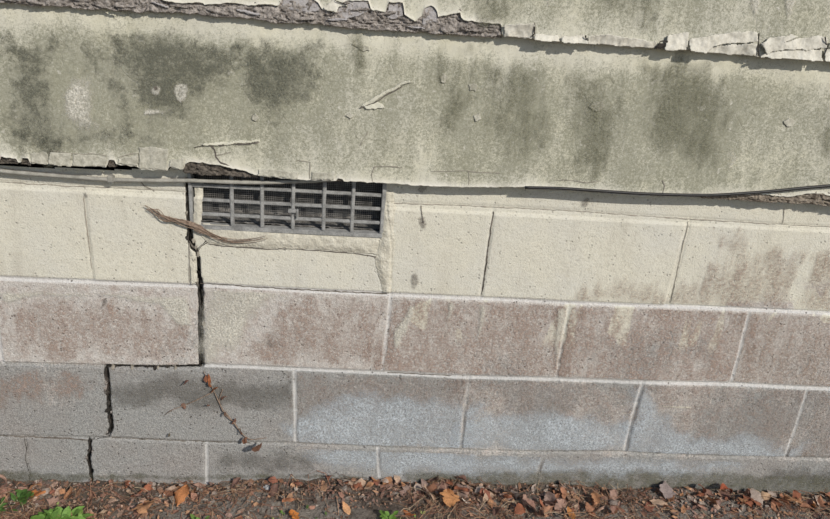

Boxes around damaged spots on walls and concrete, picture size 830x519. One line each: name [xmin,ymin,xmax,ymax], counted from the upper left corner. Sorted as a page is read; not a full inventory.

spalling [0,0,830,62]
leakage [2,33,62,157]
leakage [112,34,236,115]
leakage [238,40,321,107]
peeling [360,80,412,110]
peeling [0,147,298,179]
peeling [311,171,343,181]
spalling [701,192,830,206]
leakage [15,300,193,360]
crack [0,182,387,482]
leakage [203,291,269,362]
leakage [252,251,830,476]